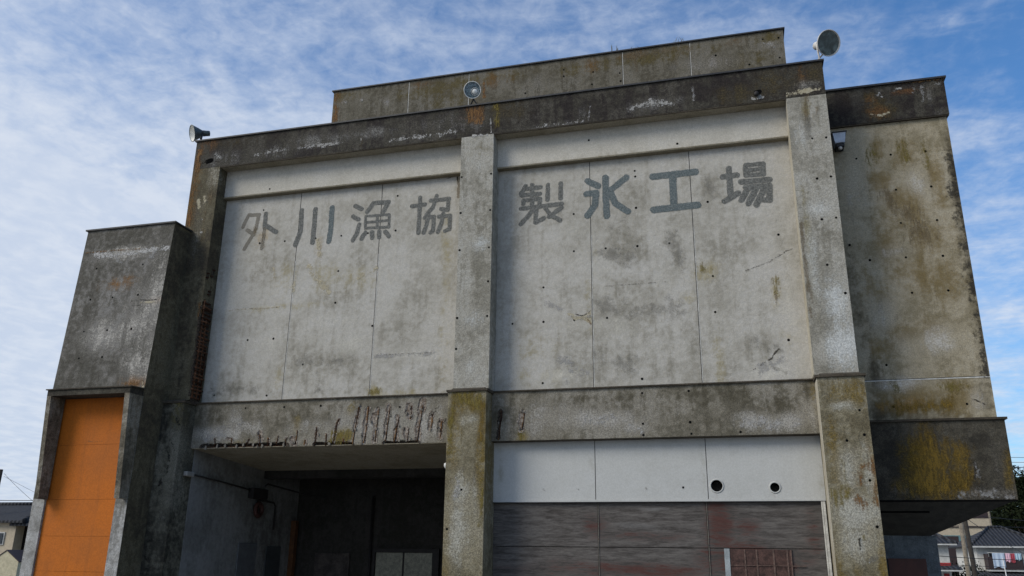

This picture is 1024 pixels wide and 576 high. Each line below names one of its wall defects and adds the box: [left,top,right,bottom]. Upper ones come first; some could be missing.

rust [188,299,212,405]
spalling [199,397,444,450]